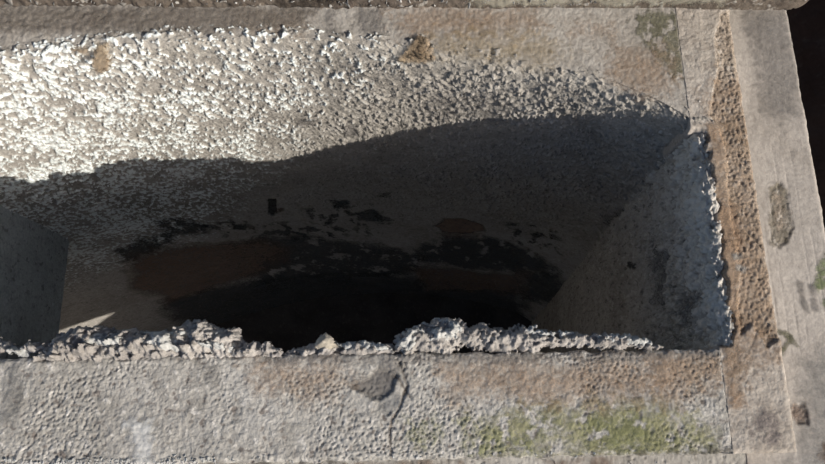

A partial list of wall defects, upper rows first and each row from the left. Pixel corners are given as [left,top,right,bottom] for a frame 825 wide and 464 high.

leakage [115,200,563,326]
crack [389,363,408,447]